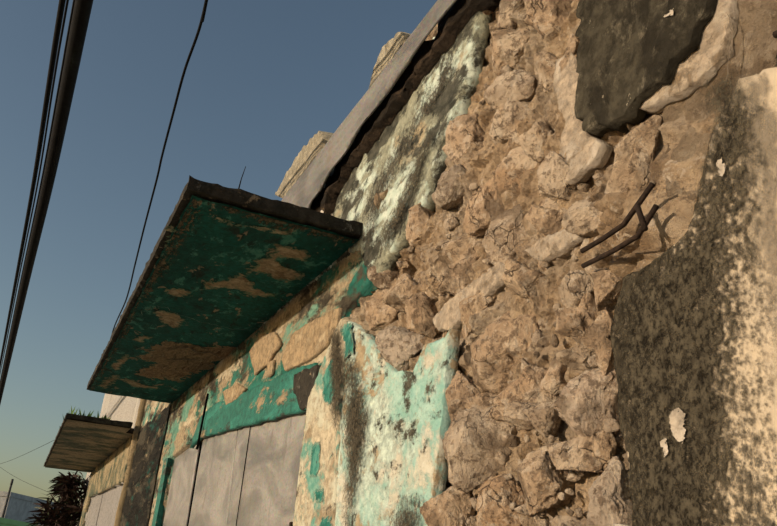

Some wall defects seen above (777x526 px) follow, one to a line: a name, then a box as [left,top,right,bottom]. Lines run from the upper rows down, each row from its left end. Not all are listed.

water stain [221,66,451,254]
spalling [97,335,236,390]
peeling [153,310,186,329]
mould [328,324,368,526]
mould [389,493,421,526]
spalling [164,0,777,526]
water stain [610,71,777,526]